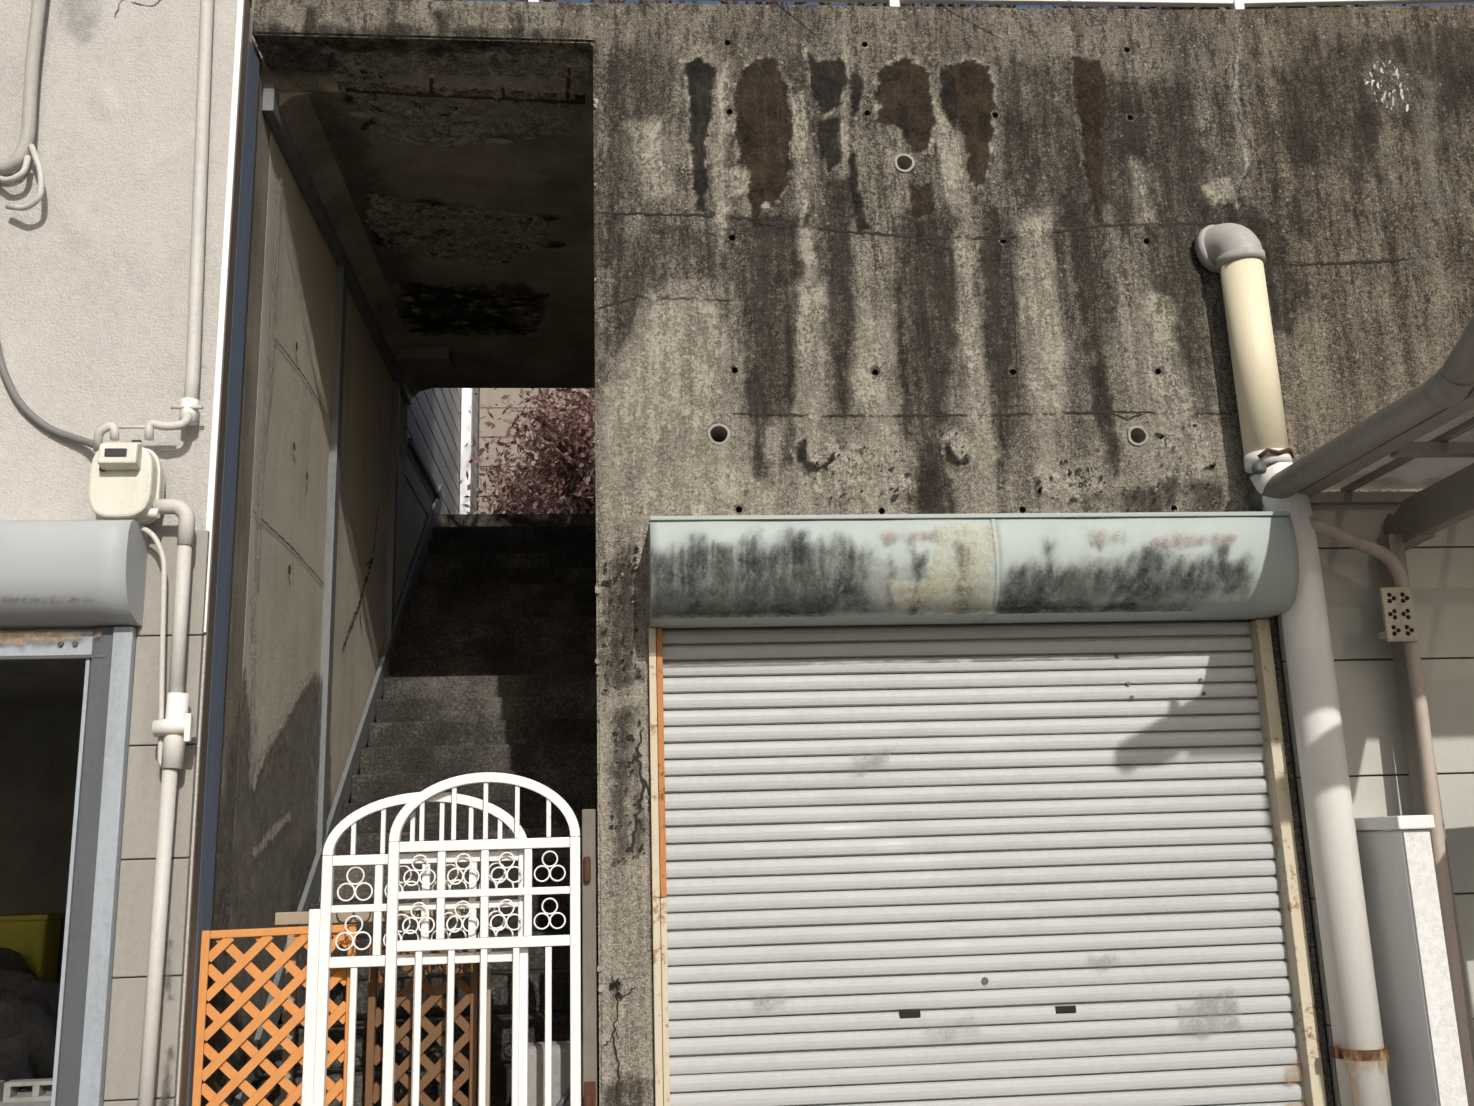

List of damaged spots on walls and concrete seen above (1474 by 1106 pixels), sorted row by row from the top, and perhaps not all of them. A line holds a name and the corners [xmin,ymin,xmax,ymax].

rust [679,54,795,227]
rust [803,42,998,236]
rust [1072,56,1108,223]
damp [253,7,1474,525]
crack [342,505,379,650]
crack [627,728,651,852]